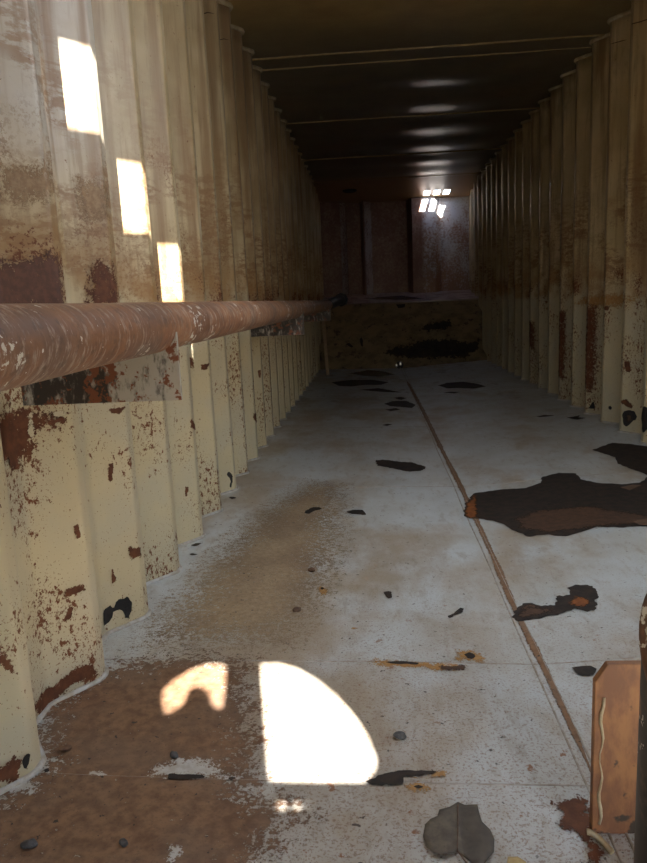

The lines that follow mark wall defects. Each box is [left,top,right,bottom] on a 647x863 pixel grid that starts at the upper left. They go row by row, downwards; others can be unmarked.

peeling [558,309,567,381]
peeling [568,304,610,419]
spalling [608,399,647,432]
spalling [463,443,647,536]
spalling [103,597,132,626]
rust [0,478,355,863]
rust [550,794,605,863]